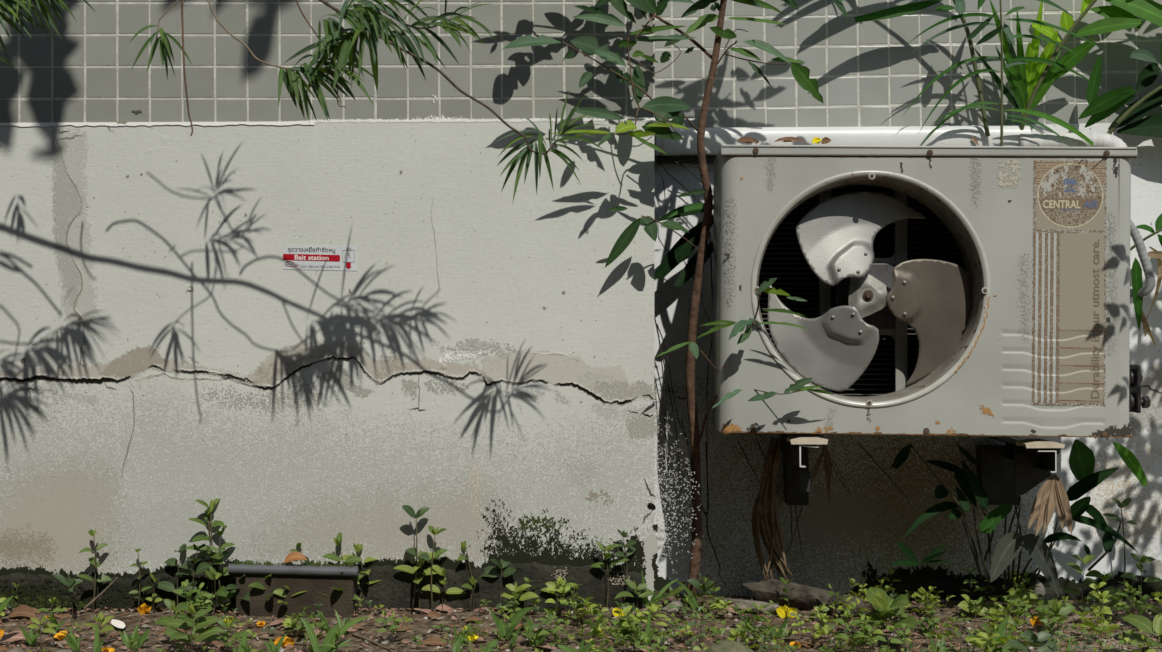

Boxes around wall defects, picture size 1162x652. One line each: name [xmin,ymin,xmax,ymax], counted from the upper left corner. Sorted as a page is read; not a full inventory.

spalling [0,337,658,408]
crack [0,131,687,478]
leakage [0,348,717,612]